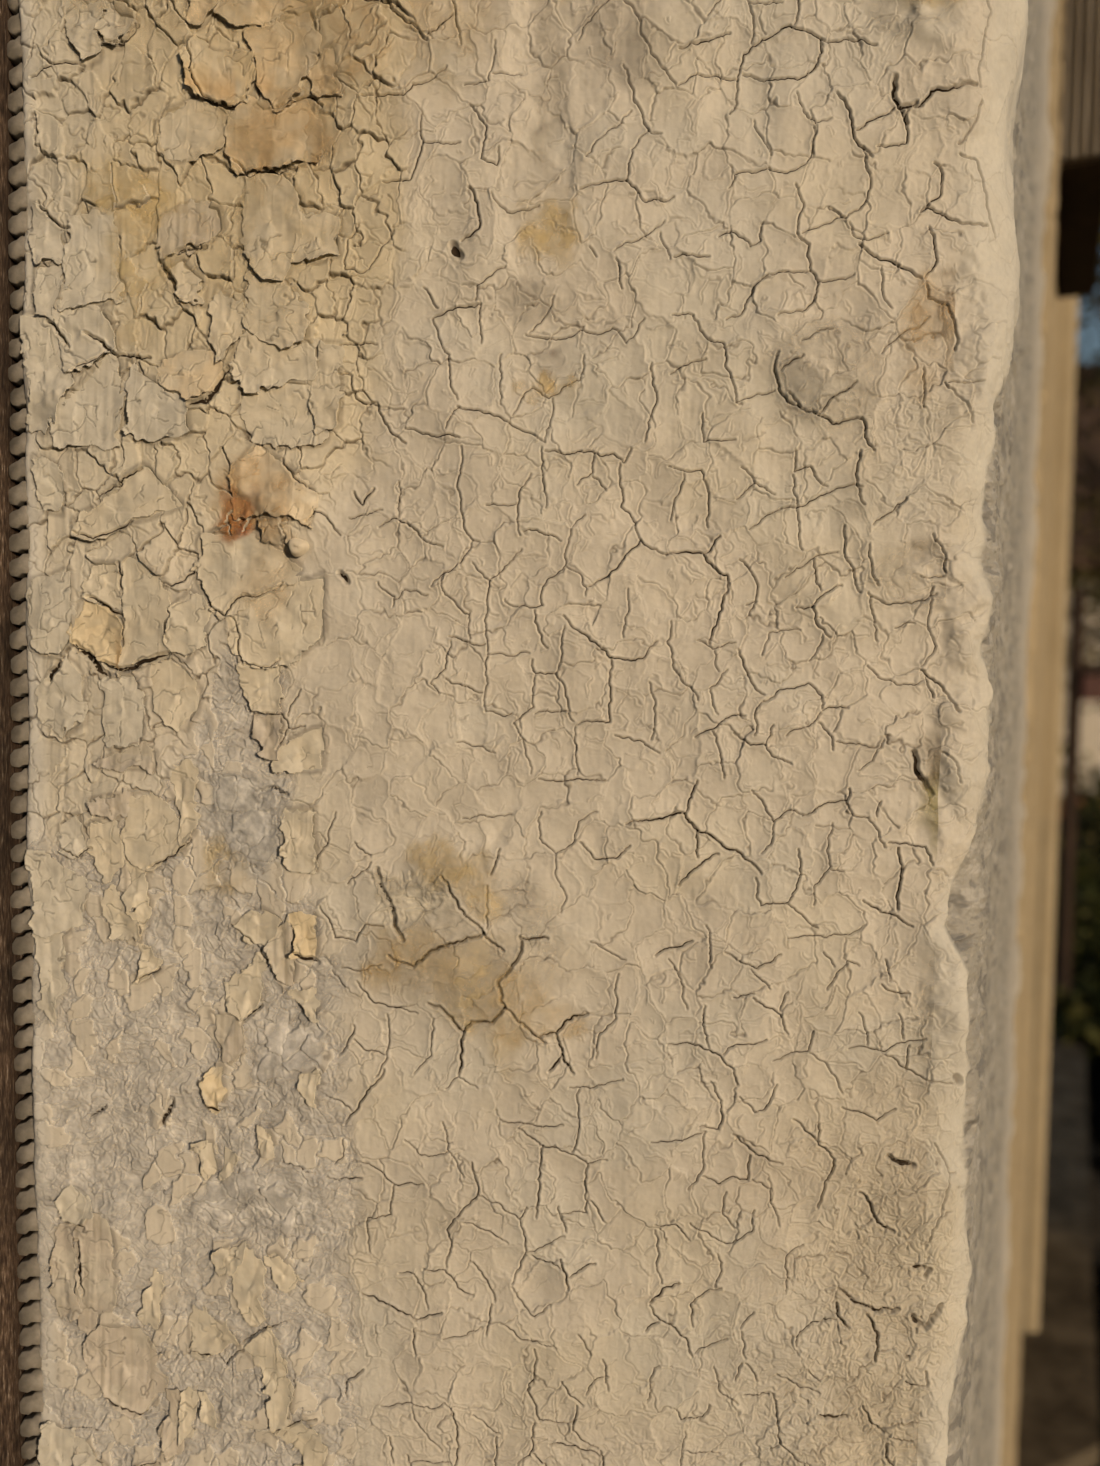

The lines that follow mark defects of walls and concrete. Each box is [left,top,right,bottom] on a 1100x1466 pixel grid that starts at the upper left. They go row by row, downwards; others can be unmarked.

crack [186,45,240,110]
crack [163,248,207,291]
crack [50,322,147,371]
crack [190,371,229,405]
corrosion [222,470,253,534]
crack [80,521,133,615]
crack [166,568,282,668]
crack [49,644,169,682]
spalling [19,0,353,1466]
crack [235,0,961,1466]
crack [162,1098,223,1124]
crack [60,1218,84,1290]